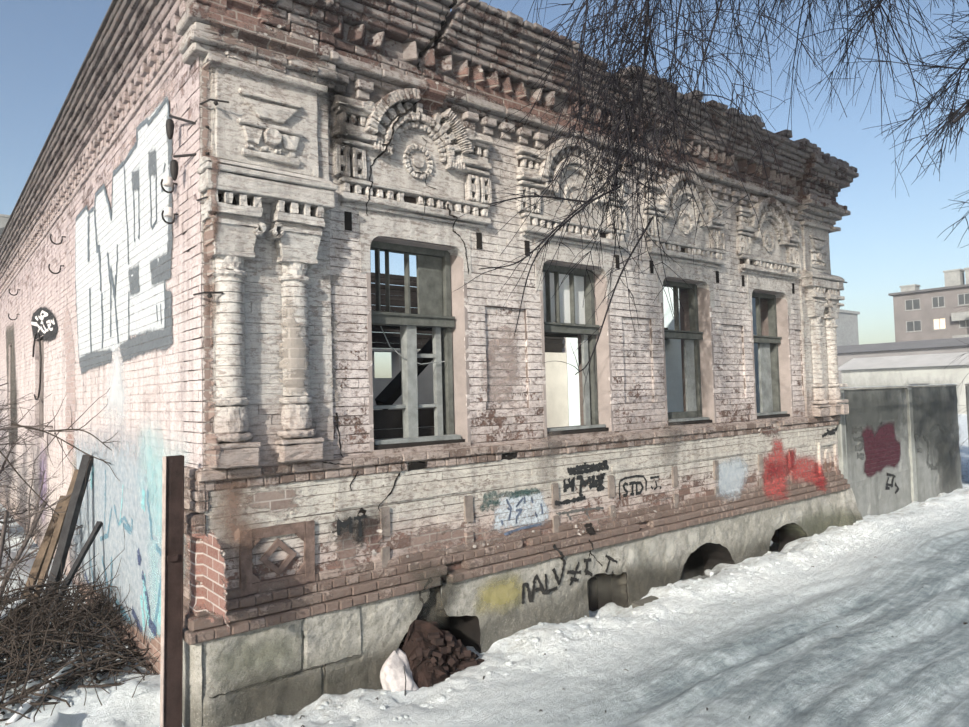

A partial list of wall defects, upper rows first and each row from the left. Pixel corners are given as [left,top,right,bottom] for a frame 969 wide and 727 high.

crack [417,0,458,70]
crack [378,467,404,511]
crack [419,577,442,615]